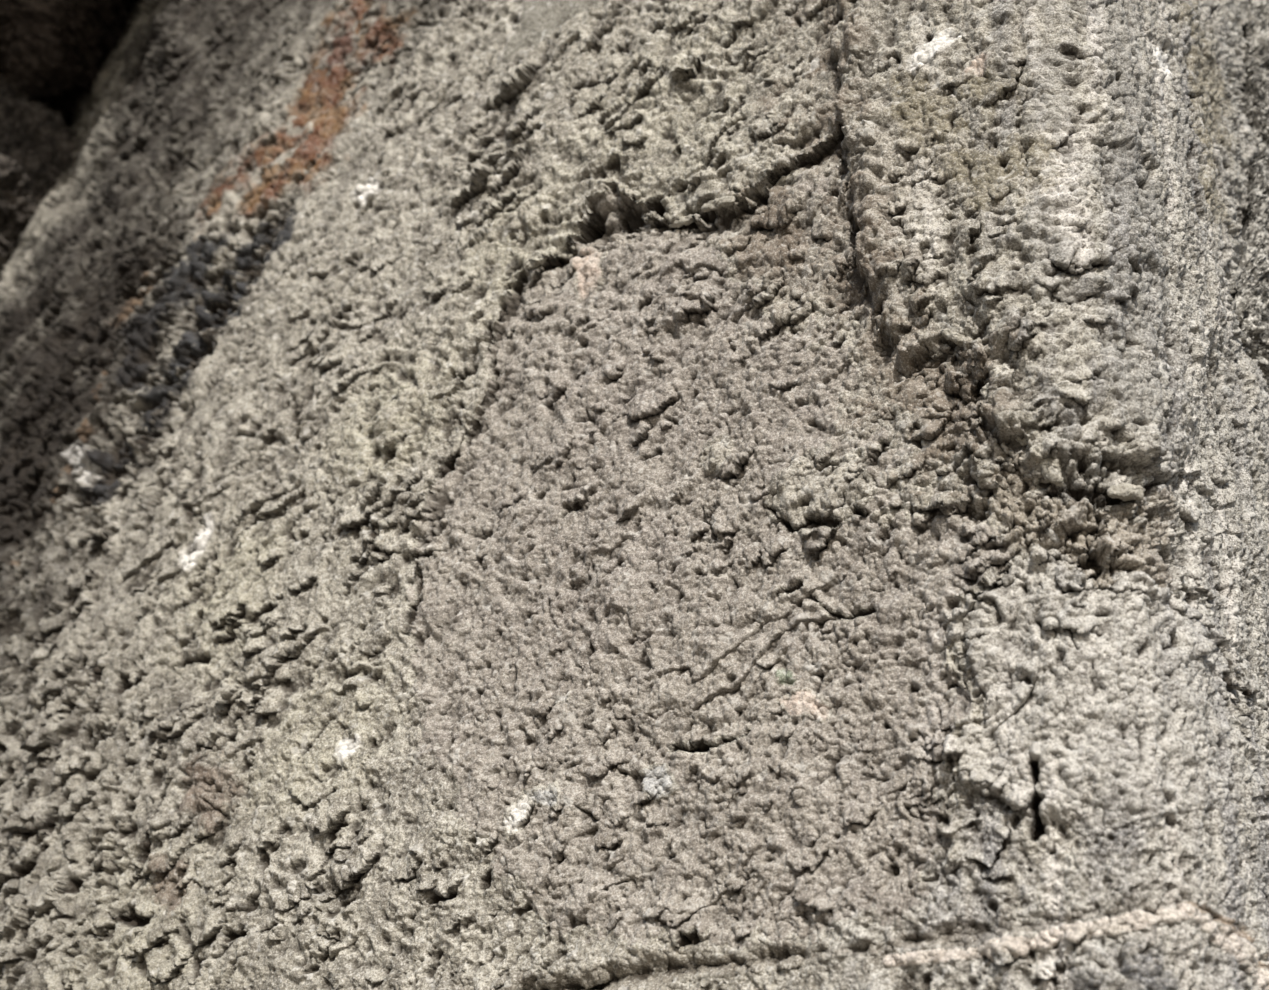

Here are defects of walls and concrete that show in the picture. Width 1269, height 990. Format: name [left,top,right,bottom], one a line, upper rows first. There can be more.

corrosion [184,0,429,247]
crack [1211,605,1269,733]
crack [1022,756,1048,845]
crack [219,918,280,947]